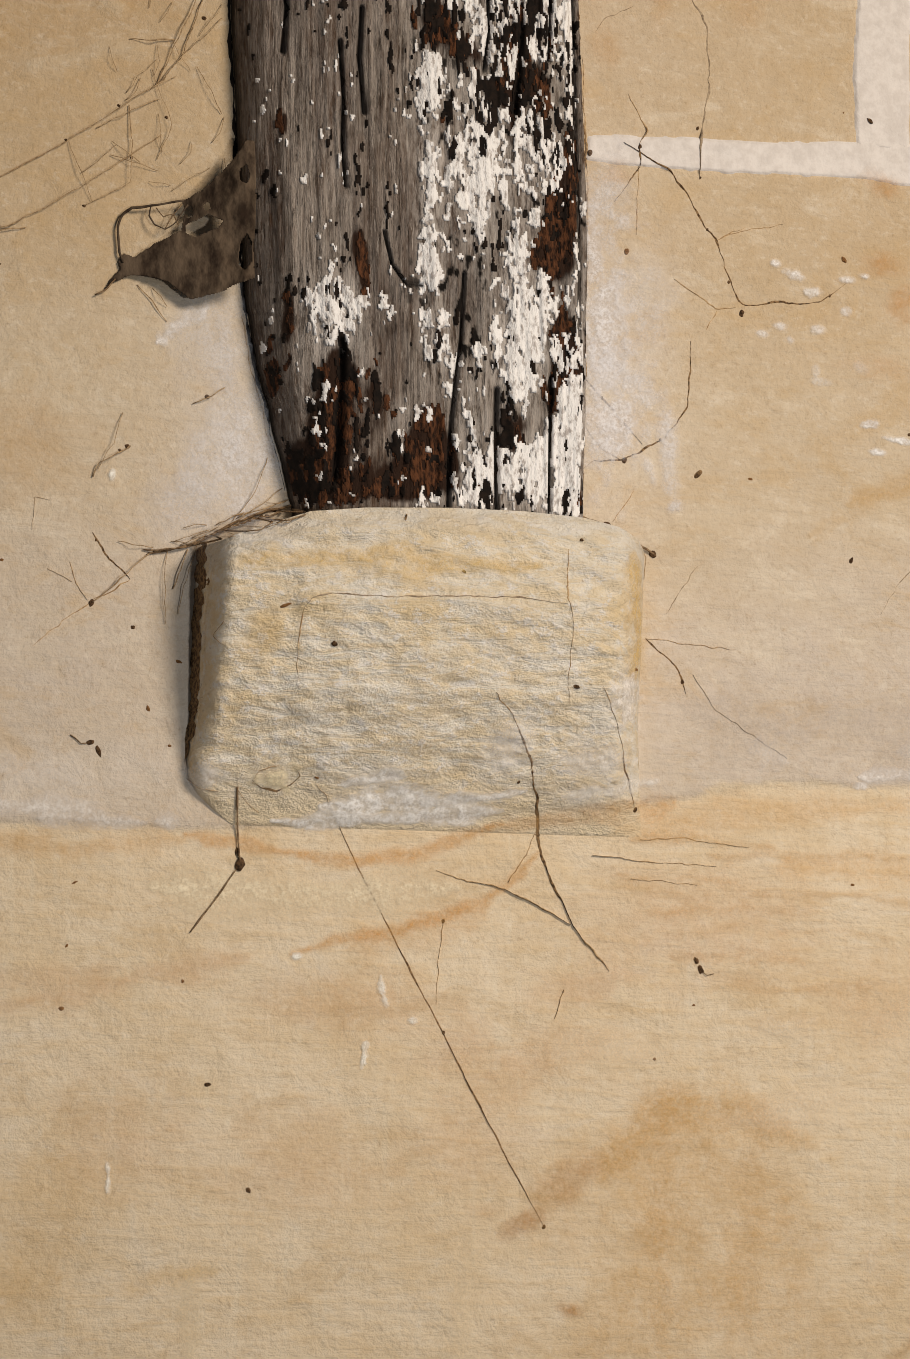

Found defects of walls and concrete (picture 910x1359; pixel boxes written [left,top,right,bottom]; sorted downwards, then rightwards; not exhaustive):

crack [227,0,237,159]
peeling [214,413,273,511]
crack [239,241,285,490]
peeling [319,379,331,403]
peeling [304,259,397,346]
peeling [414,0,650,517]
crack [483,0,845,521]
crack [436,692,608,969]
crack [317,786,546,1229]